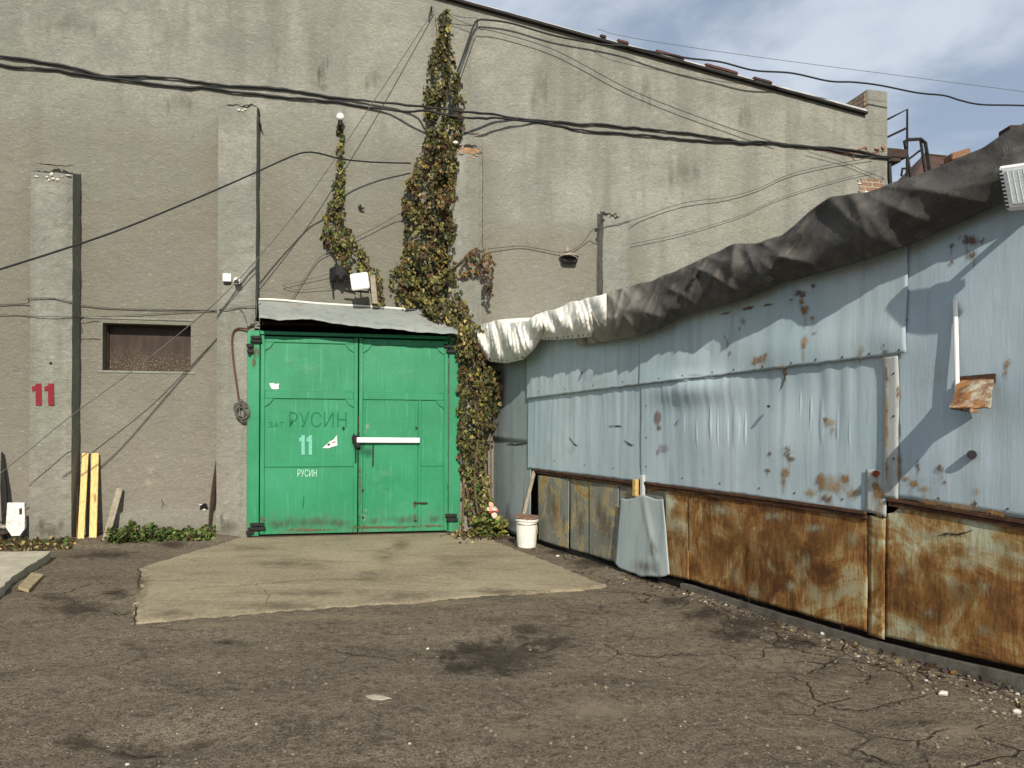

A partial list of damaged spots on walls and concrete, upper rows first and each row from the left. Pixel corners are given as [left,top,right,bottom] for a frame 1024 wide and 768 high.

rust [807,472,859,502]
rust [871,367,1004,517]